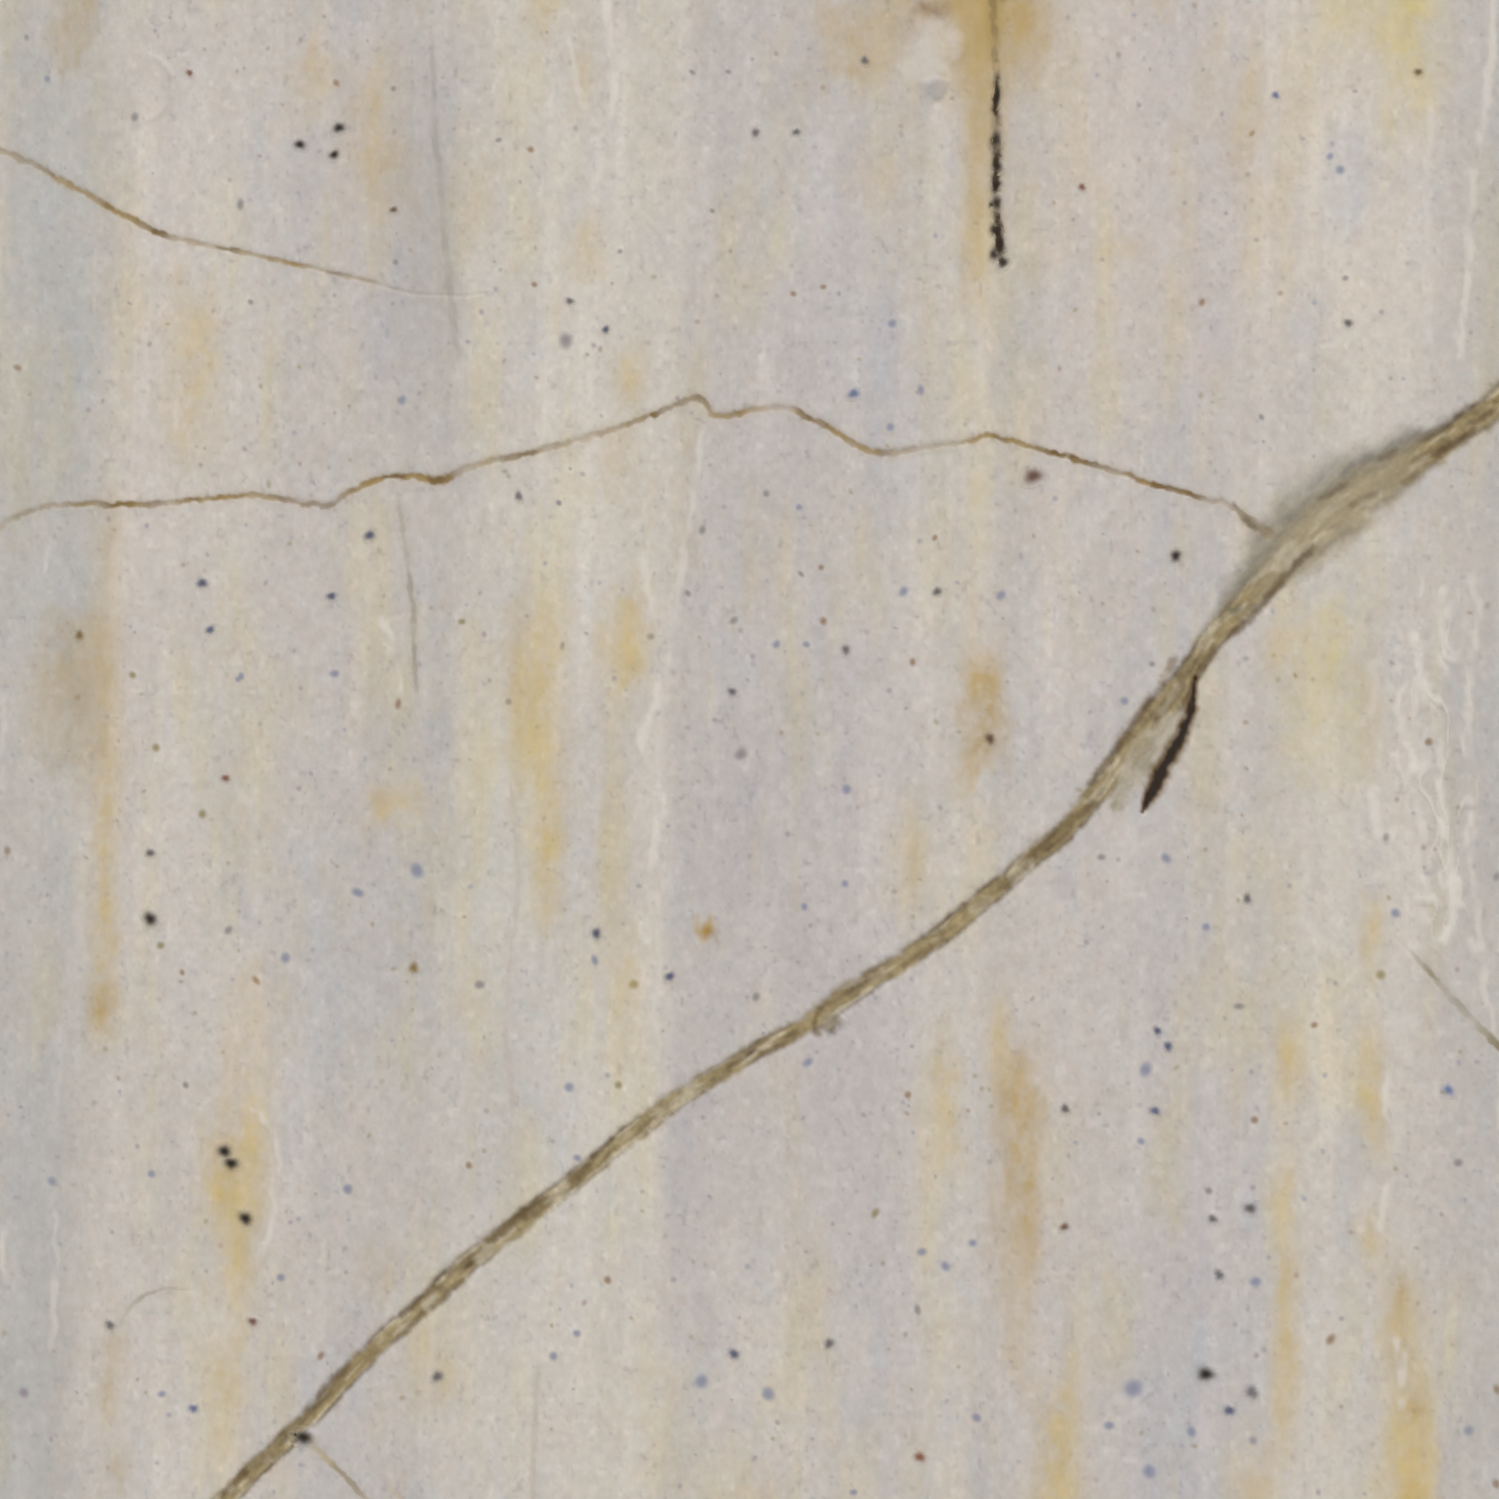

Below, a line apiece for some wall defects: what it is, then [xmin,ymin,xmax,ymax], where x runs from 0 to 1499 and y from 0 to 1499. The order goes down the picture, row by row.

crack [0,13,467,369]
crack [980,0,1015,273]
water stain [1429,0,1499,422]
water stain [1423,427,1499,1017]
crack [0,373,1499,1499]
water stain [1431,1183,1499,1499]